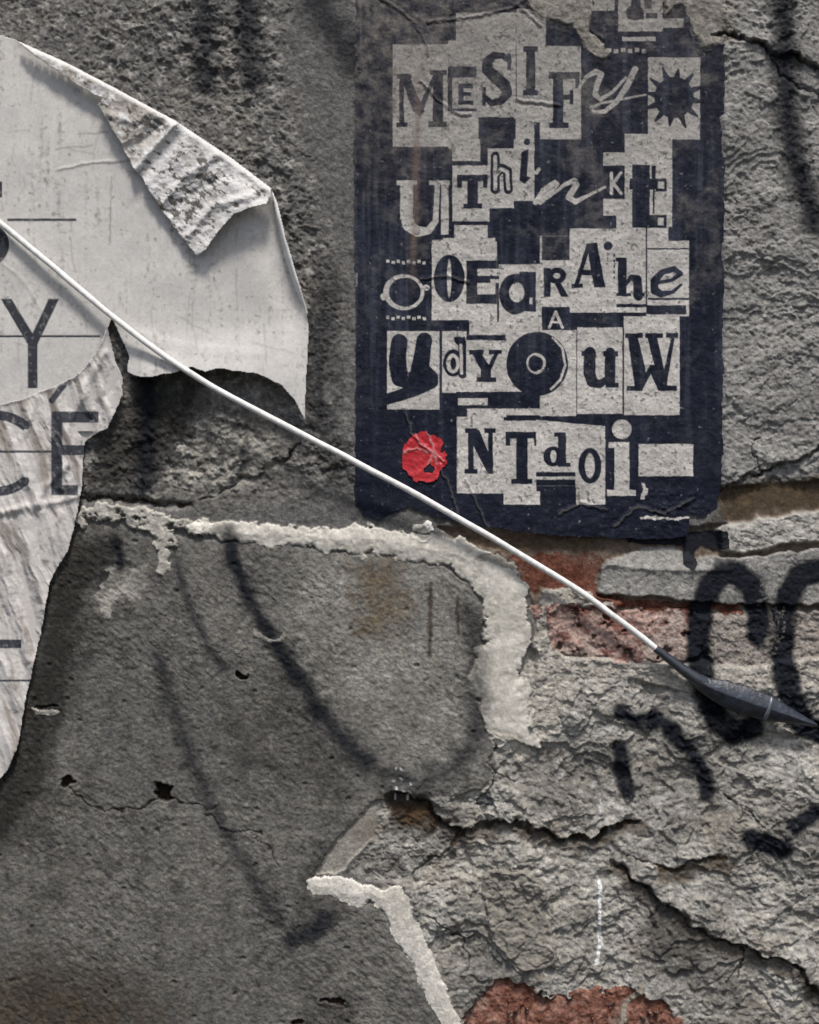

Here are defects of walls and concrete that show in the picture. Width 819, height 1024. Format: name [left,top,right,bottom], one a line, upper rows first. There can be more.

crack [715,31,819,89]
spalling [494,550,691,663]
spalling [711,602,743,615]
crack [66,784,274,857]
spalling [306,793,683,1024]
crack [386,791,818,993]